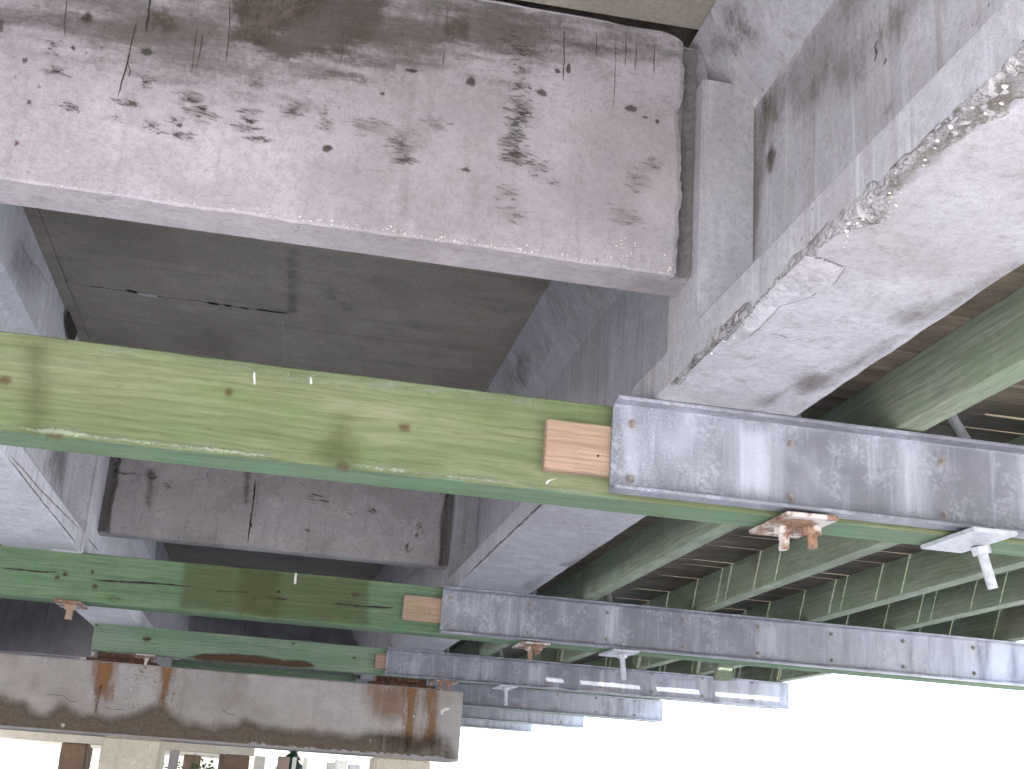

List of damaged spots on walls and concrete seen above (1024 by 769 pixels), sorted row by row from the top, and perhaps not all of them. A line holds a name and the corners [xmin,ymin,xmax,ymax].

crack [118,0,151,95]
leakage [0,0,656,99]
spalling [670,44,1024,386]
crack [65,279,287,314]
crack [248,483,256,540]
corrosion [92,661,118,698]
corrosion [161,667,176,699]
leakage [0,694,453,759]
corrosion [404,688,437,745]